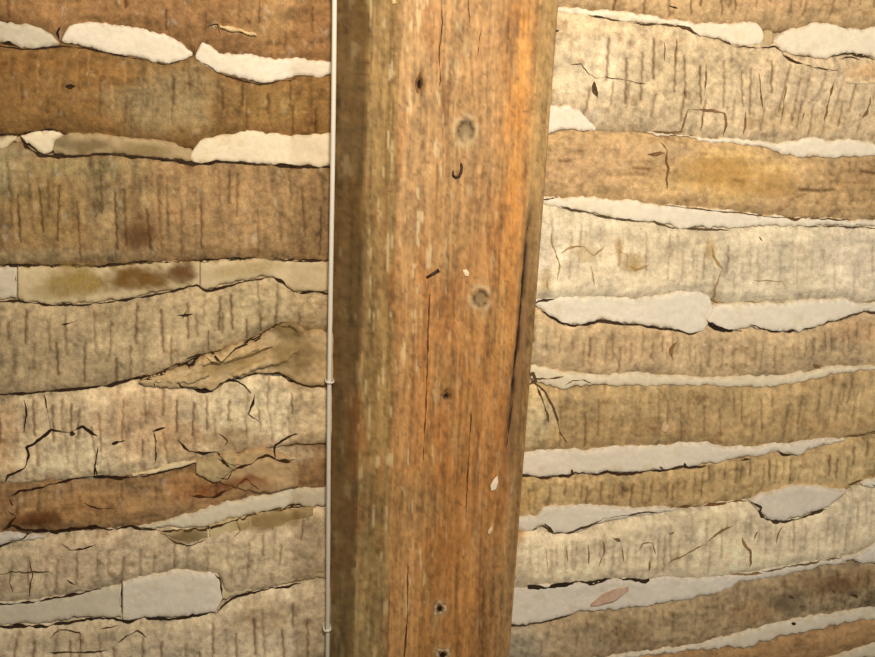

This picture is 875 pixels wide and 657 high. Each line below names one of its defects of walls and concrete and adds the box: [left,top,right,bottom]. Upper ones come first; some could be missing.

peeling [0,21,331,83]
peeling [558,6,875,59]
peeling [0,130,331,167]
peeling [647,132,875,159]
peeling [543,196,875,229]
peeling [0,258,329,305]
peeling [536,291,875,335]
crack [0,322,303,551]
peeling [523,437,844,477]
peeling [0,569,264,625]
crack [0,563,301,654]
peeling [512,543,875,625]